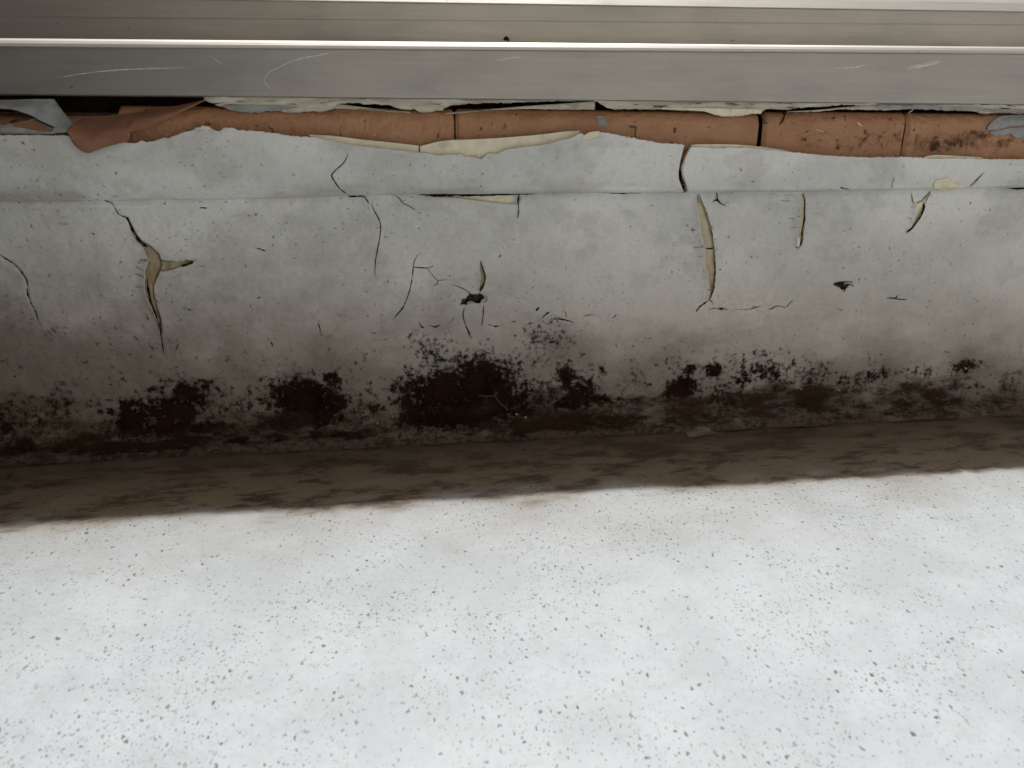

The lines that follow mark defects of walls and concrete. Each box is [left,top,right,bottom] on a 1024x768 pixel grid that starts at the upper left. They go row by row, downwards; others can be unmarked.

peeling [0,99,207,153]
peeling [309,131,599,159]
peeling [987,114,1024,139]
crack [678,159,686,191]
crack [331,153,414,267]
peeling [791,194,806,248]
peeling [905,177,966,233]
crack [0,255,42,328]
crack [104,200,194,356]
crack [394,255,454,328]
crack [709,301,792,310]
leakage [0,317,1020,456]